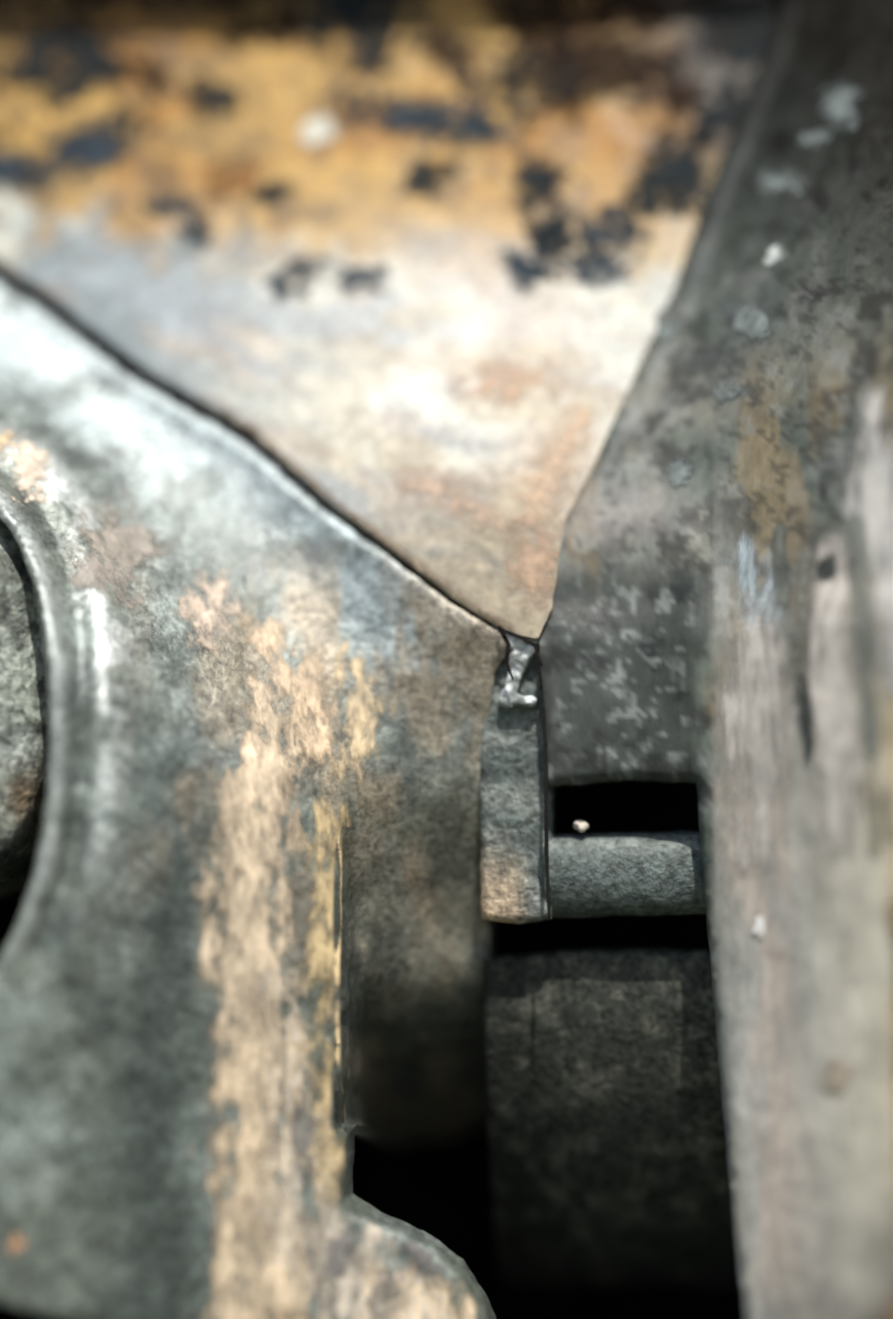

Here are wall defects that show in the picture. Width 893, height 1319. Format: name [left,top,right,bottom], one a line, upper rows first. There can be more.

rust [852,768,893,854]